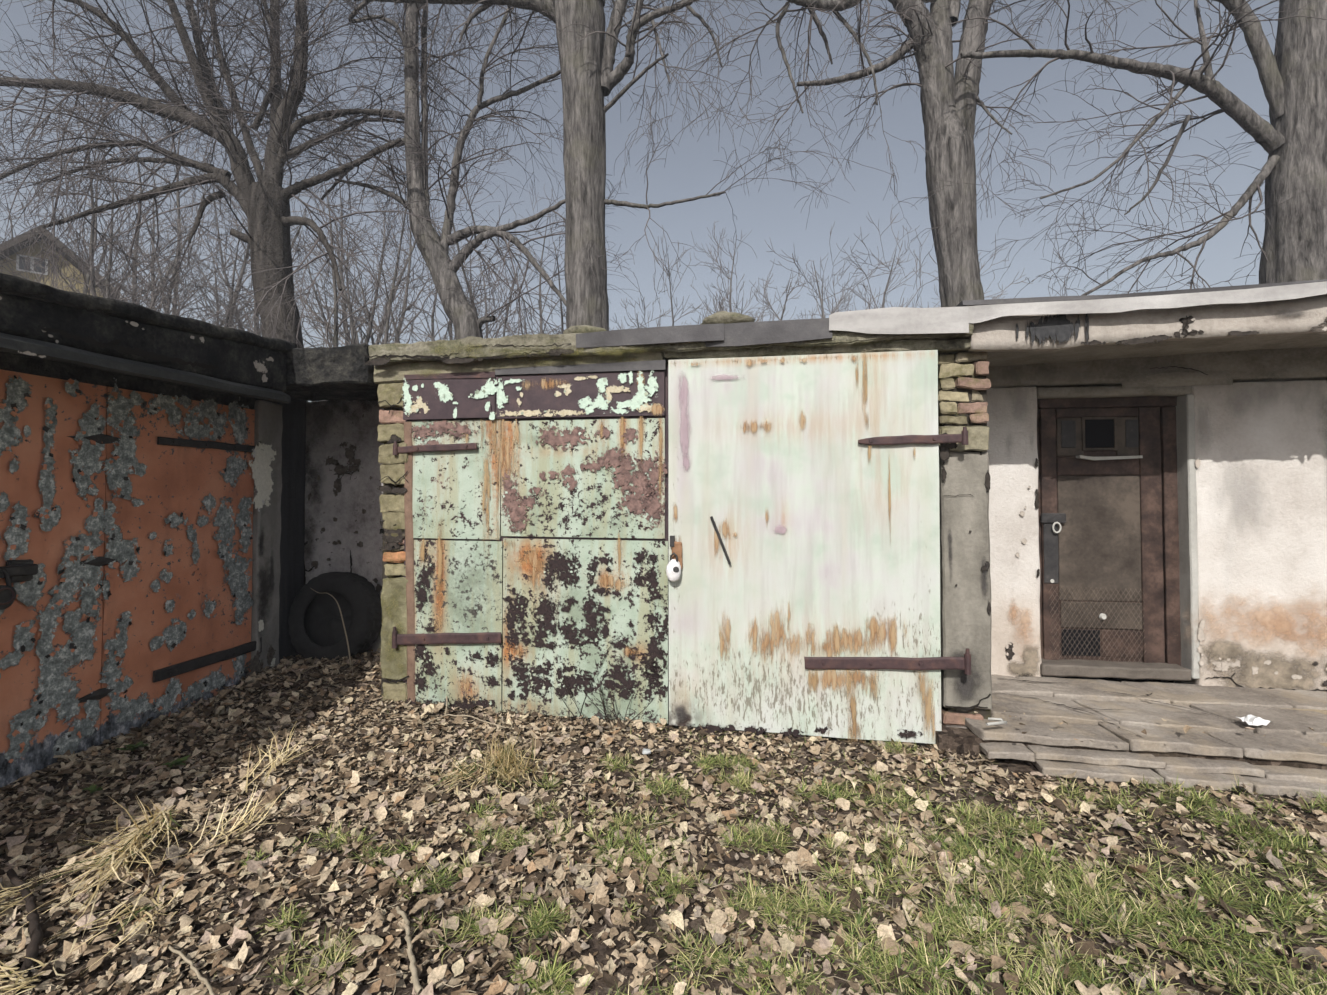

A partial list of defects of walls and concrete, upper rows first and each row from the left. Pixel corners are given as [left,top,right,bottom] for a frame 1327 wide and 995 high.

spalling [1081,316,1204,345]
spalling [1310,317,1327,333]
rust [465,418,499,528]
peeling [387,370,668,533]
rust [640,404,662,456]
peeling [680,377,690,470]
peeling [0,375,277,770]
peeling [398,548,669,712]
rust [720,619,731,656]
rust [750,604,907,740]
rust [919,673,935,736]
damp [1203,605,1327,691]